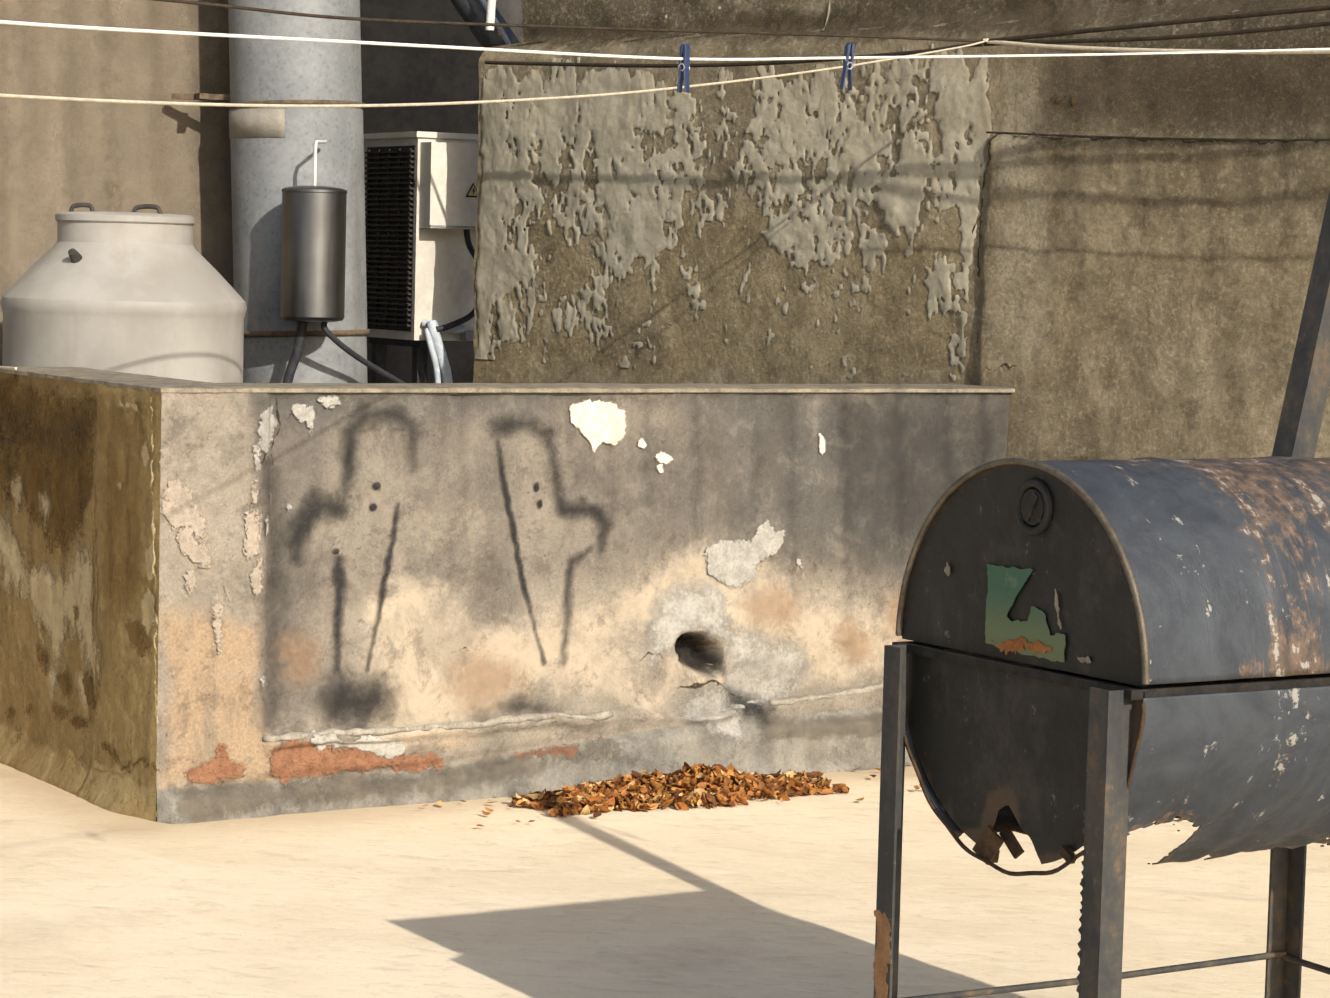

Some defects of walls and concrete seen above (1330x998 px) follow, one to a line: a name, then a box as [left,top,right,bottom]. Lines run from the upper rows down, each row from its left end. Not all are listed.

peeling [475,43,992,381]
flaking render [569,399,673,473]
peeling [704,520,786,588]
water stain [35,617,94,733]